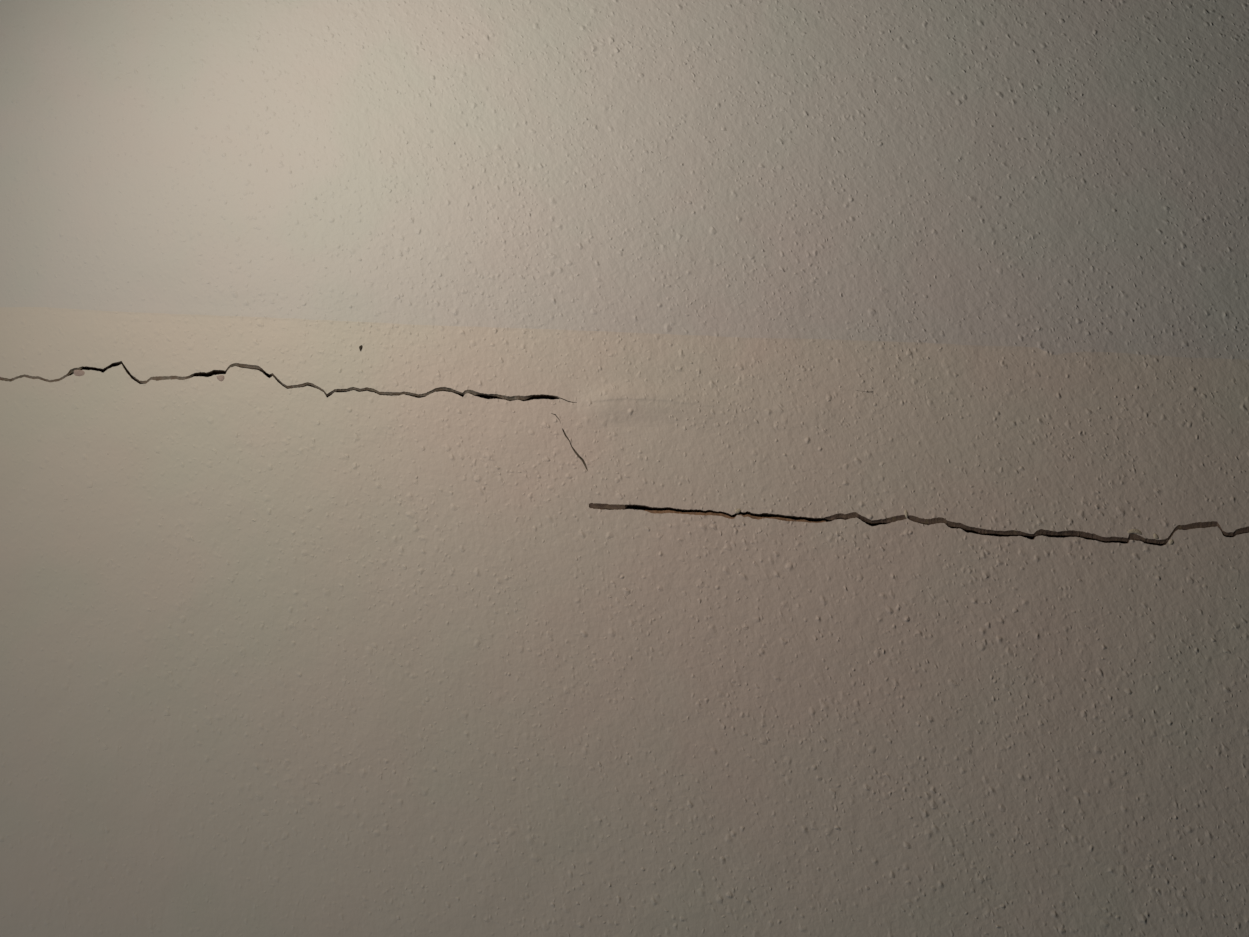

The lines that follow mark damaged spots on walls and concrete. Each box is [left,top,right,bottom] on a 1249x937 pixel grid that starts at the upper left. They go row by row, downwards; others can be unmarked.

crack [0,361,588,471]
crack [589,503,1249,546]